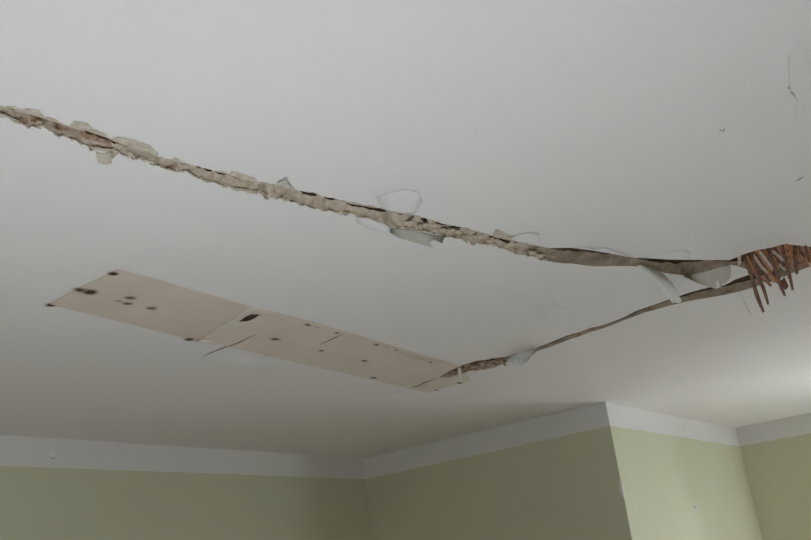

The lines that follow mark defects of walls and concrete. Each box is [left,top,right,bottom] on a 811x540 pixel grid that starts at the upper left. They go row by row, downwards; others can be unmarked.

peeling [375,190,422,215]
peeling [355,216,446,247]
crack [0,106,810,388]
peeling [511,233,541,246]
peeling [577,247,629,257]
peeling [639,250,692,260]
peeling [684,265,731,289]